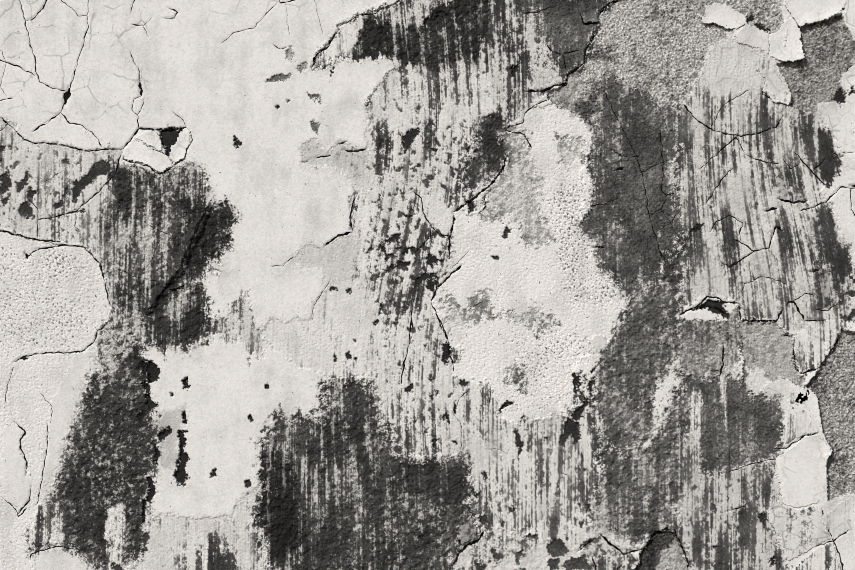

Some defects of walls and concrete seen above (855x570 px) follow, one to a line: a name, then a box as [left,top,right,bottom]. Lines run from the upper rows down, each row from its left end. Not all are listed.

crack [222,0,399,68]
crack [506,0,618,148]
crack [0,0,209,401]
peeling [0,120,269,570]
crack [303,141,365,162]
crack [325,193,358,245]
crack [401,156,507,384]
peeling [254,0,855,570]
crack [577,72,855,570]
crack [5,393,52,517]
crack [30,546,96,570]
crack [452,531,484,566]